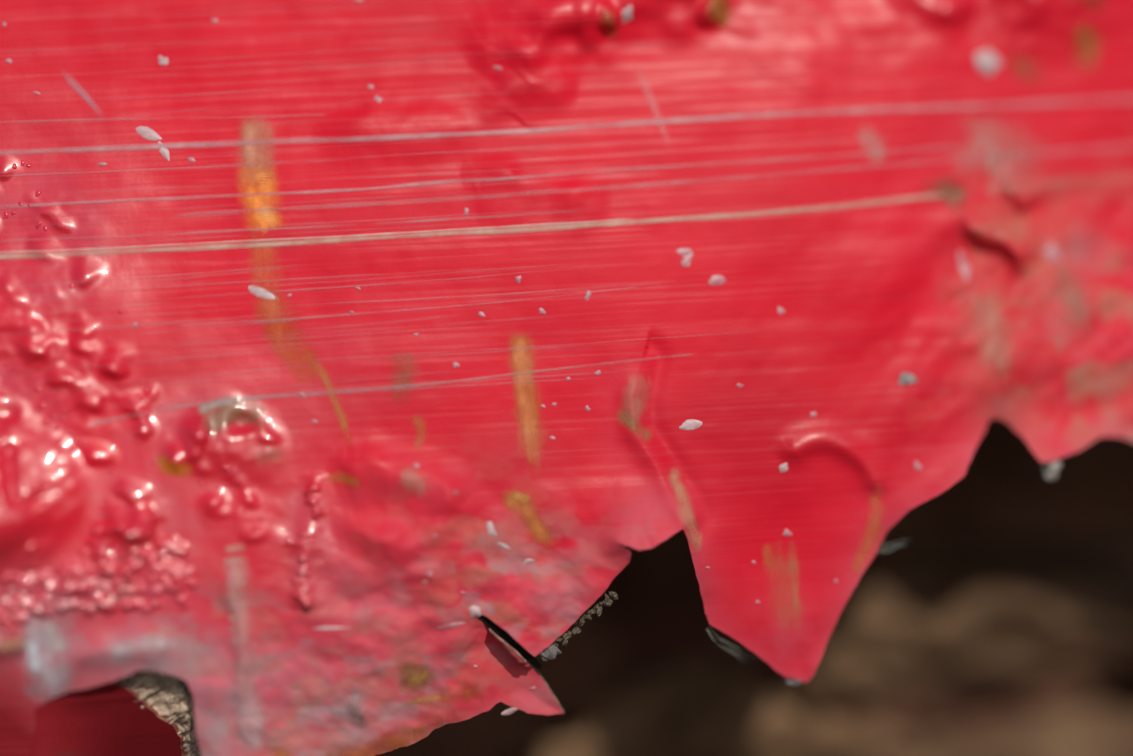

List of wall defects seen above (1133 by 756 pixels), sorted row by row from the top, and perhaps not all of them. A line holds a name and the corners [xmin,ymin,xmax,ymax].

rust [243,123,330,390]
rust [512,337,538,457]
peeling [486,521,511,550]
peeling [436,605,482,629]
spalling [536,591,618,661]
spalling [114,670,201,756]